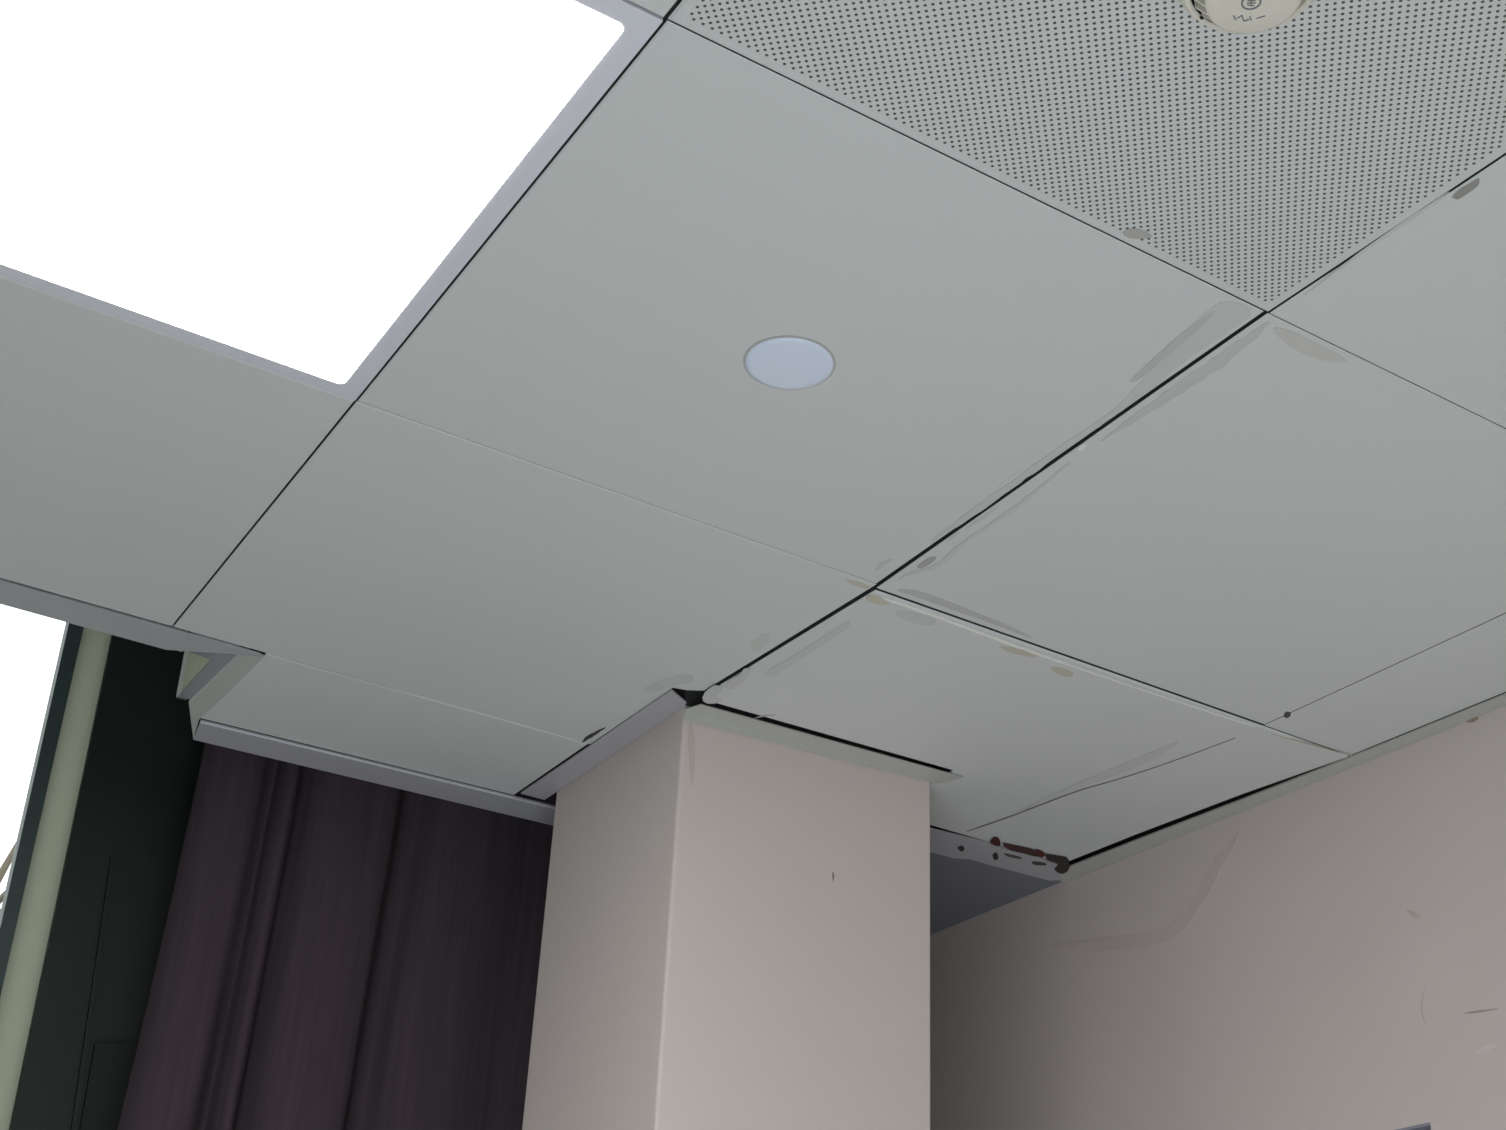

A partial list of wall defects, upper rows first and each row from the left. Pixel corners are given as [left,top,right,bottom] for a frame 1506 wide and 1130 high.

rust [990,837,1045,858]